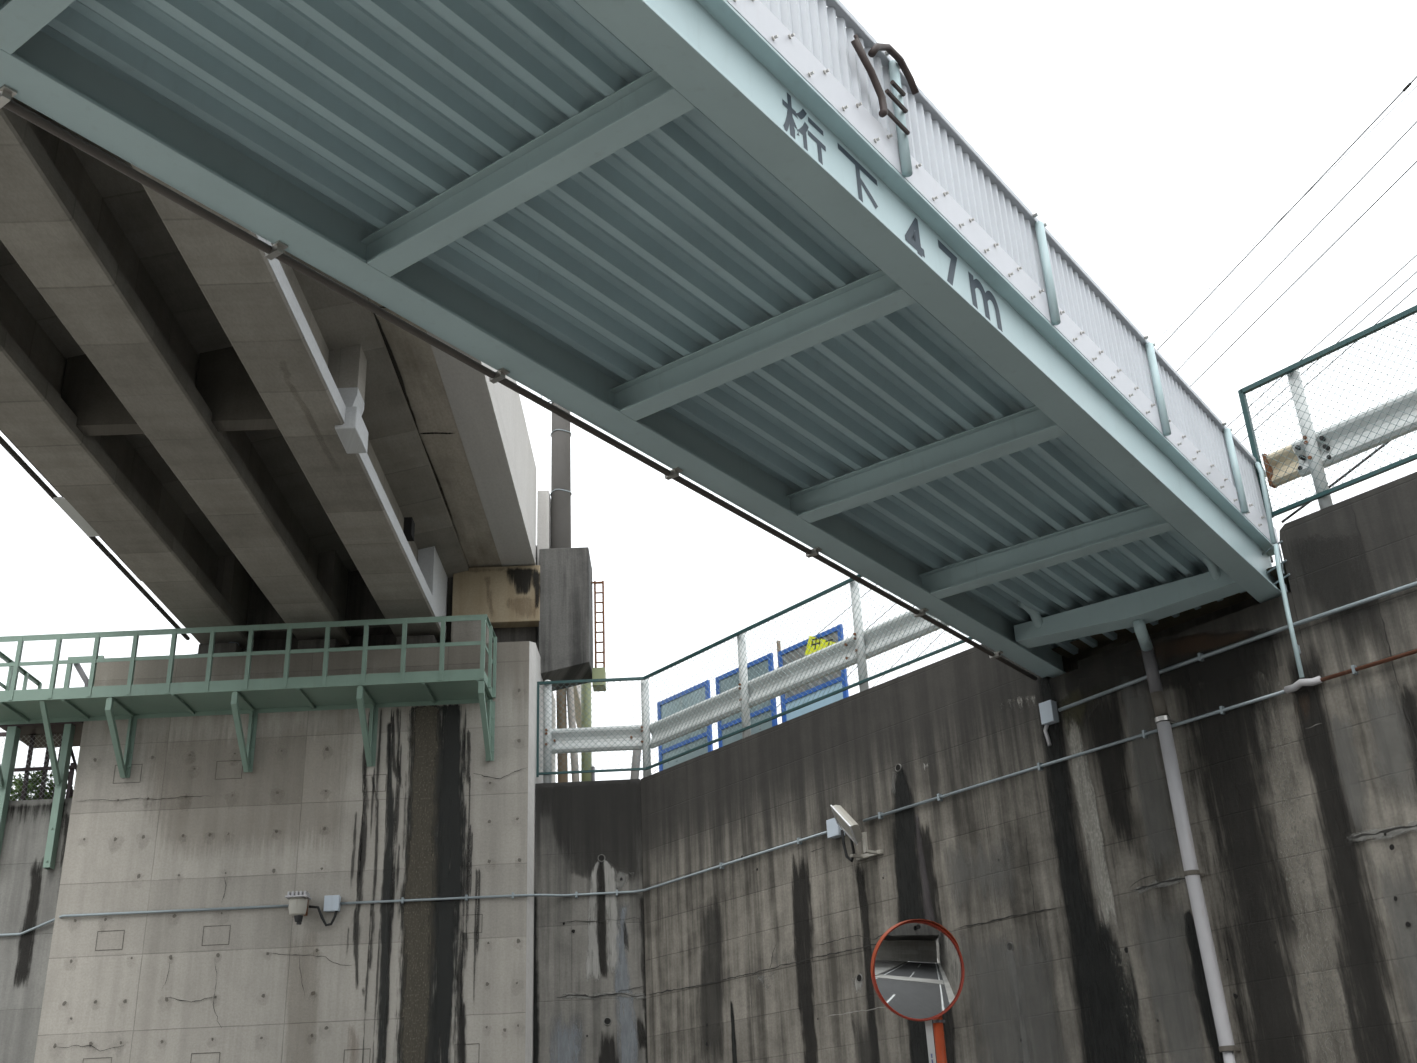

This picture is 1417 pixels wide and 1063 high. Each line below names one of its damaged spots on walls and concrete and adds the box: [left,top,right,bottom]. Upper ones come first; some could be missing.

leakage [507,568,541,608]
leakage [1295,535,1375,644]
leakage [14,860,43,985]
leakage [347,704,480,1063]
leakage [533,892,579,1063]
leakage [541,783,648,1063]
leakage [700,904,737,1063]
leakage [792,856,818,1063]
leakage [907,1008,955,1063]
leakage [892,767,1013,925]
leakage [1038,629,1417,1063]
crack [1345,821,1417,841]